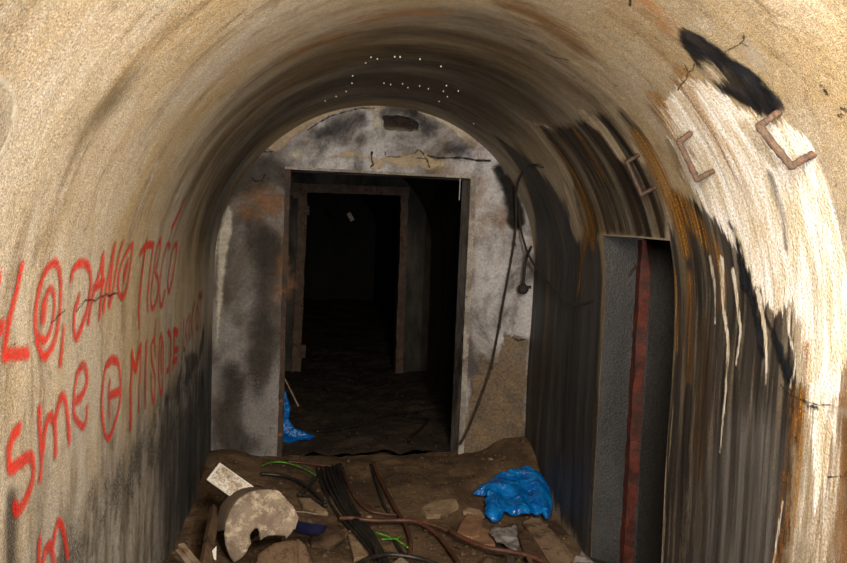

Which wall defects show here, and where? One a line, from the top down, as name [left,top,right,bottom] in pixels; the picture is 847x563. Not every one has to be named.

crack [371,150,491,167]
crack [54,292,118,321]
leakage [527,69,847,563]
leakage [89,331,212,538]